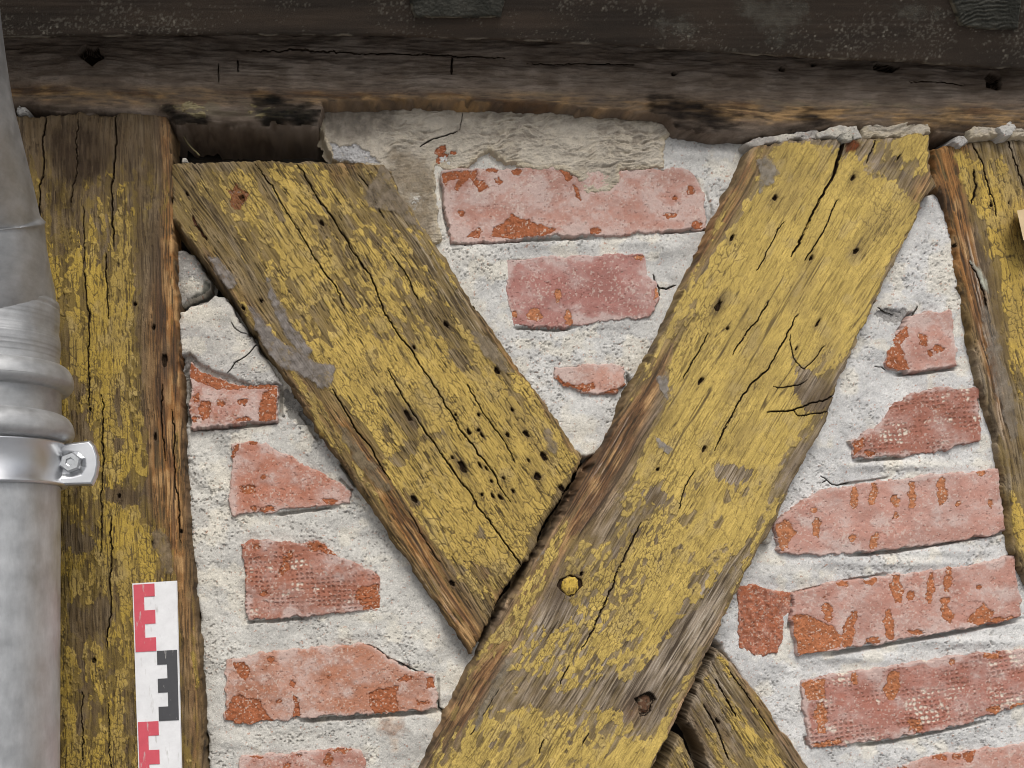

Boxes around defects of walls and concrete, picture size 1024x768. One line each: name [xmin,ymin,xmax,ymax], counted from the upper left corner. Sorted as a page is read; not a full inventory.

crack [255,164,345,309]
spalling [434,145,522,192]
crack [757,143,844,270]
crack [71,117,118,650]
spalling [190,364,312,430]
crack [297,165,515,501]
crack [714,314,832,451]
spalling [874,308,945,371]
crack [388,370,521,566]
spalling [355,584,381,610]
spalling [791,566,955,656]
peeling [486,625,701,725]